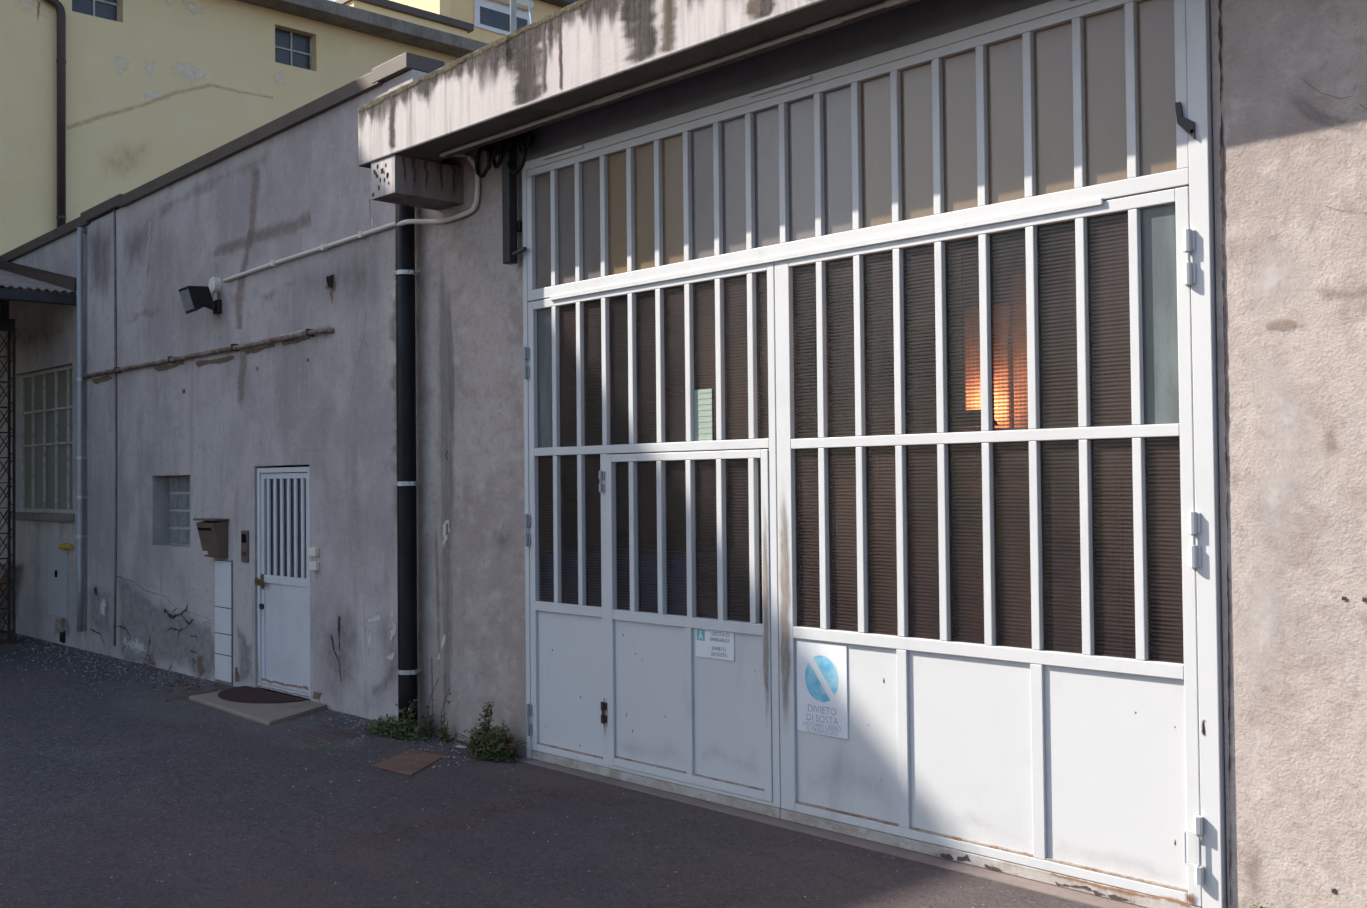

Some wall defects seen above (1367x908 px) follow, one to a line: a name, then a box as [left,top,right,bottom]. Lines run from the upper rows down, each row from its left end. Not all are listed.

water stain [747,0,774,18]
water stain [358,0,676,193]
crack [90,576,212,670]
flaking render [91,585,215,678]
flaking render [235,634,251,682]